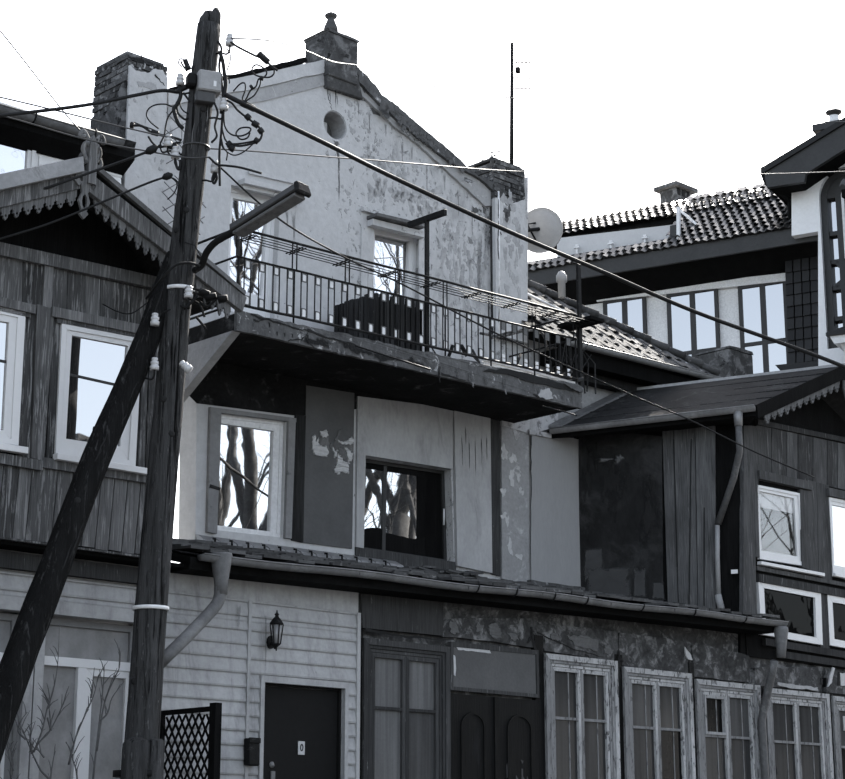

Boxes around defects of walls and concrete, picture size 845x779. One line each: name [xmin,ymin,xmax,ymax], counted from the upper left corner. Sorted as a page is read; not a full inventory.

peeling [336,88,491,332]
flaking render [500,189,524,312]
peeling [312,430,354,474]
peeling [500,442,524,497]
peeling [500,512,523,560]